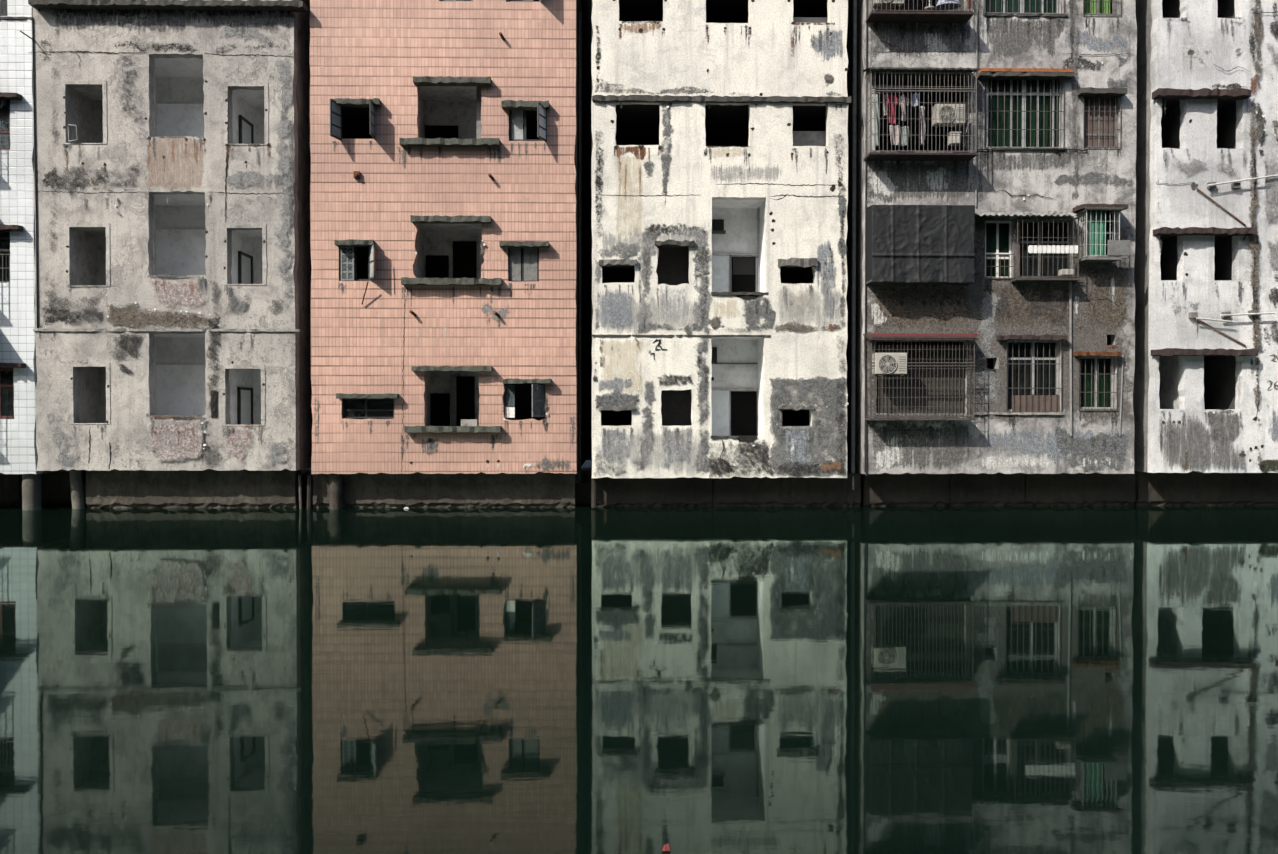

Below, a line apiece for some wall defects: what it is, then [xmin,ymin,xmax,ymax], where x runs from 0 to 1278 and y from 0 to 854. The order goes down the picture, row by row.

water stain [39,277,290,468]
water stain [38,9,294,315]
corrosion [614,145,662,159]
corrosion [618,22,665,38]
water stain [595,26,712,203]
water stain [594,131,847,477]
water stain [794,26,843,62]
water stain [1160,0,1278,472]